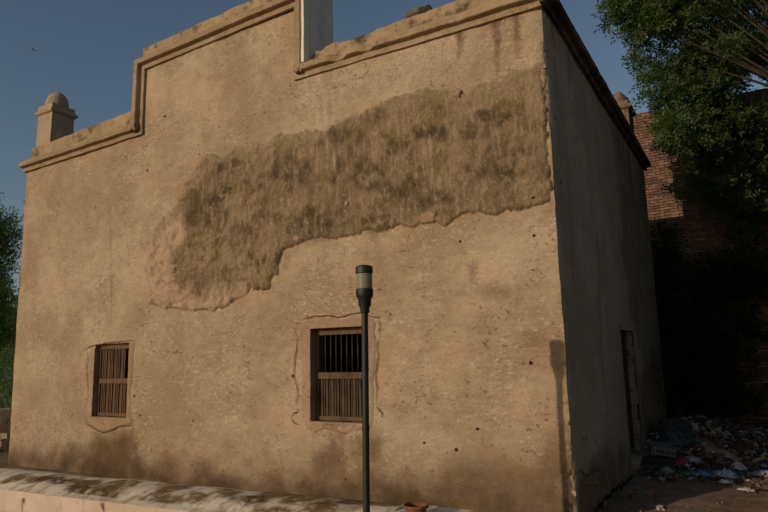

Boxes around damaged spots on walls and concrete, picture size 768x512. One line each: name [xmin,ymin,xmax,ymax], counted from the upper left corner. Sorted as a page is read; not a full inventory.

crack [291,312,382,425]
crack [576,469,633,512]